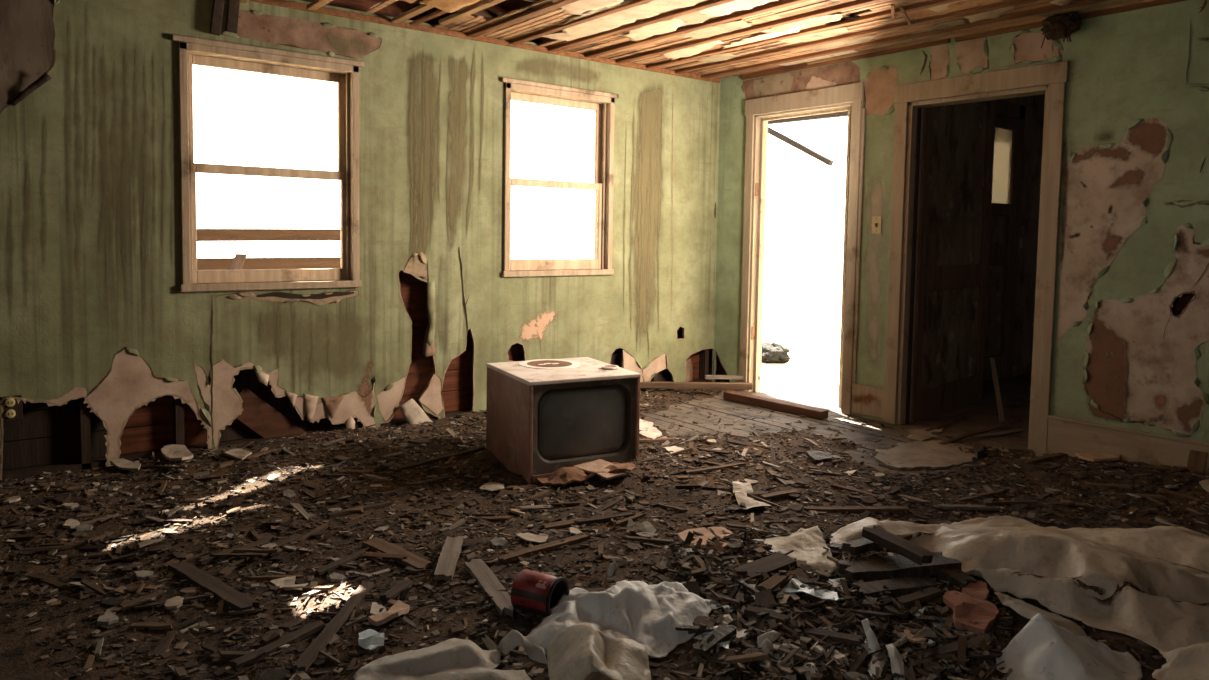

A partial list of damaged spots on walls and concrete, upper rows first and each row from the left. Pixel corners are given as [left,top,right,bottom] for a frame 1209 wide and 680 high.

peeling [929,37,989,80]
peeling [1009,29,1064,65]
peeling [863,65,898,115]
damp [408,54,484,261]
damp [623,88,663,353]
peeling [1057,117,1209,438]
peeling [507,311,555,362]
spalling [0,252,475,480]
peeling [610,347,731,391]